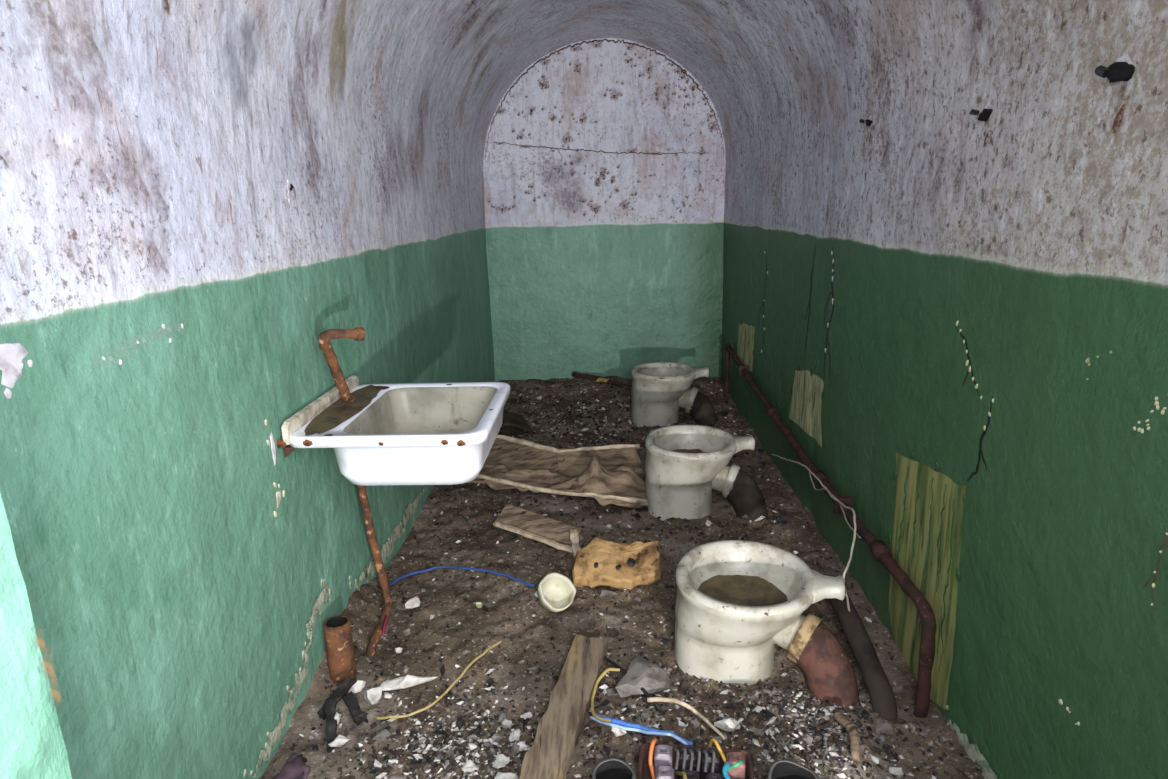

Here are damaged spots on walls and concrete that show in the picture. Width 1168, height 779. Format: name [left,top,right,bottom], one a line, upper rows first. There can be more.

peeling [0,343,33,399]
crack [955,321,994,481]